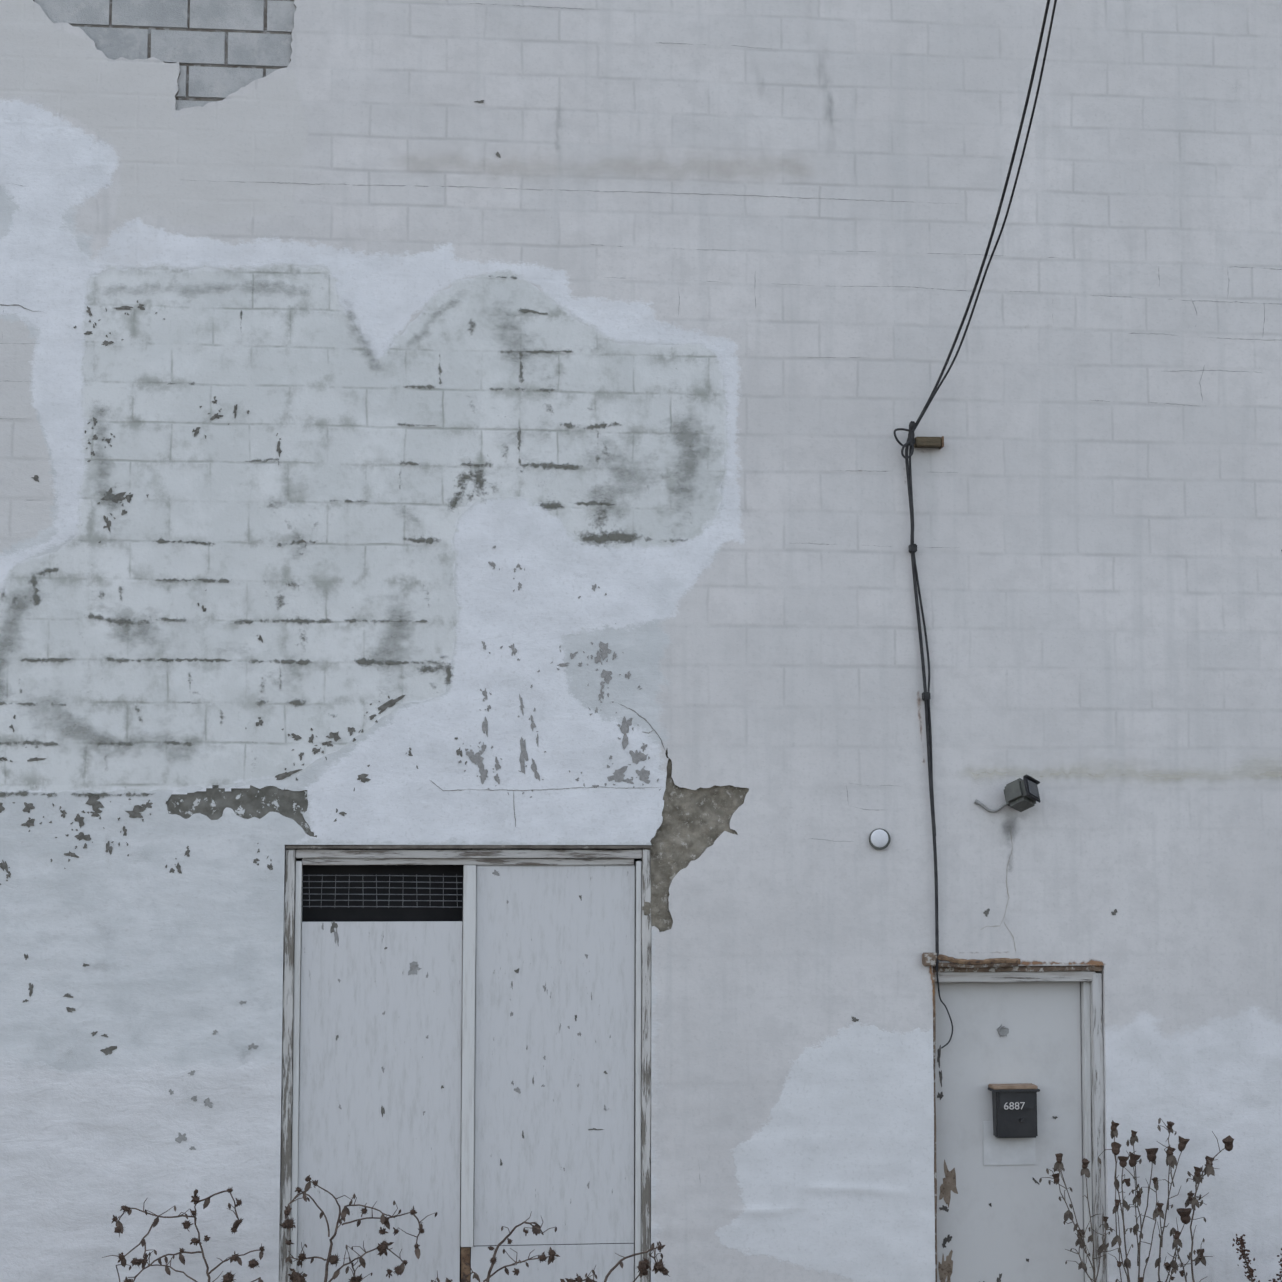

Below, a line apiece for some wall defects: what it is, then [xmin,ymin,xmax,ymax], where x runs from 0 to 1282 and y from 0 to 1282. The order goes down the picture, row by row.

spalling [34,0,297,110]
peeling [0,264,749,947]
peeling [91,1031,117,1056]
peeling [939,1159,958,1212]
peeling [938,1235,953,1282]